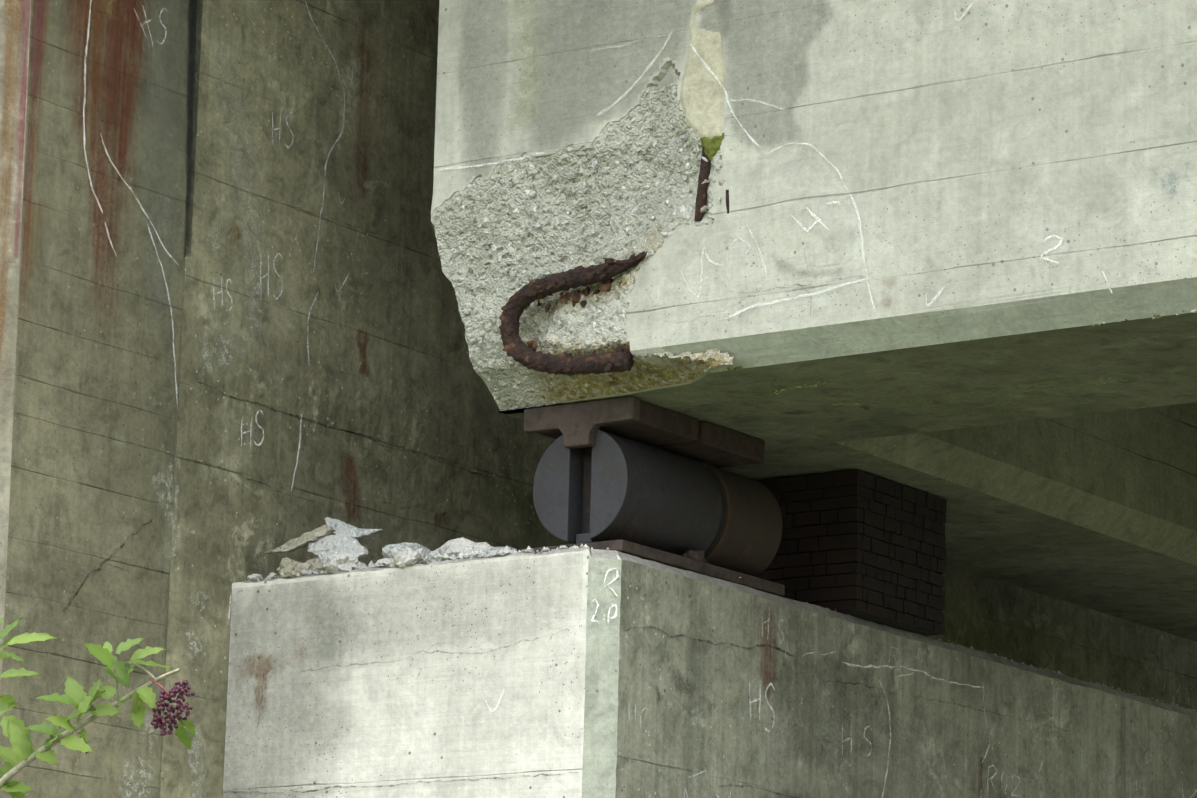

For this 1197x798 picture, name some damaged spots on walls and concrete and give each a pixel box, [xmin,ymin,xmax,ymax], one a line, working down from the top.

corrosion [75,0,135,262]
corrosion [499,251,645,321]
spalling [431,82,743,419]
corrosion [502,338,630,372]
crack [63,520,152,611]